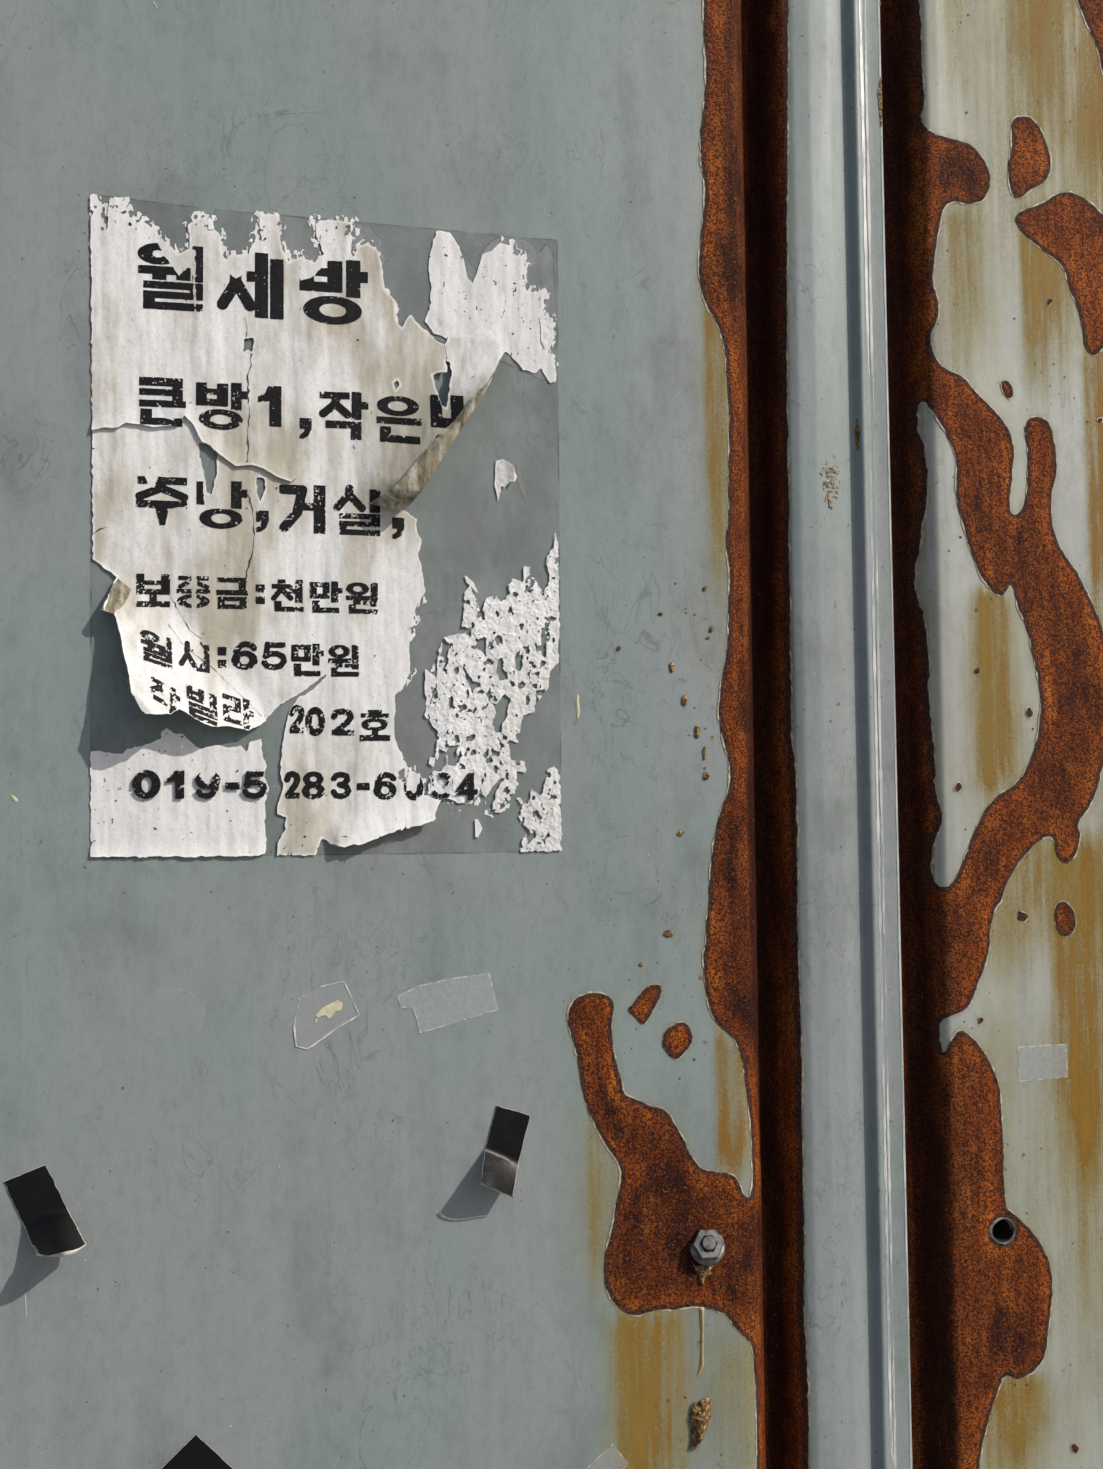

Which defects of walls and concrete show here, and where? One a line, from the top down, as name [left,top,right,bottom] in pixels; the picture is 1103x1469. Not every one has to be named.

corrosion [567,0,811,1469]
corrosion [880,0,1103,1469]